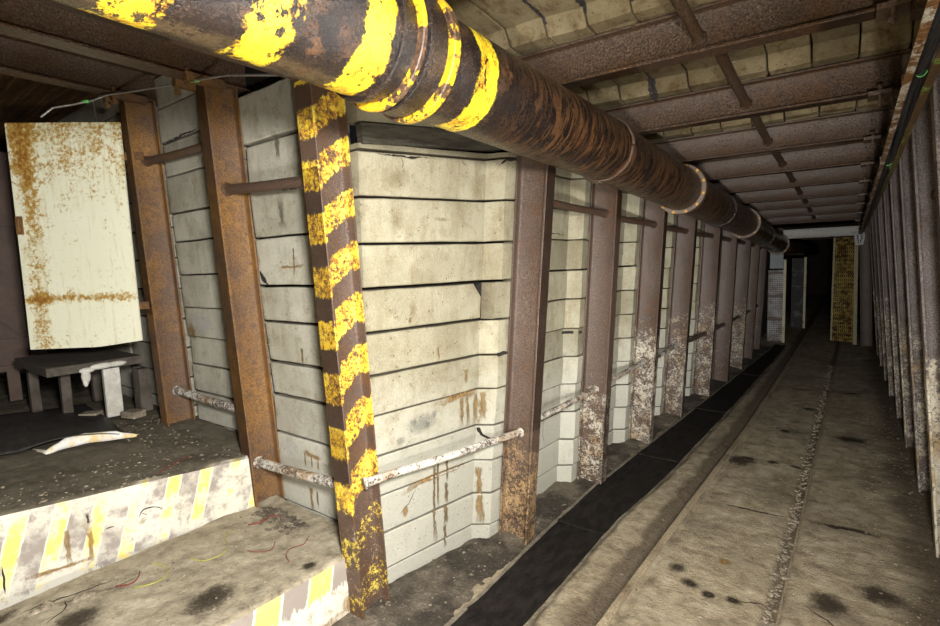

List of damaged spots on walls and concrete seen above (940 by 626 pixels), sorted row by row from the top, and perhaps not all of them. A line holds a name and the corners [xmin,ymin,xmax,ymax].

corrosion [446,370,486,422]
corrosion [414,461,463,543]
corrosion [475,468,484,521]
damp [810,592,846,614]
damp [861,587,904,608]